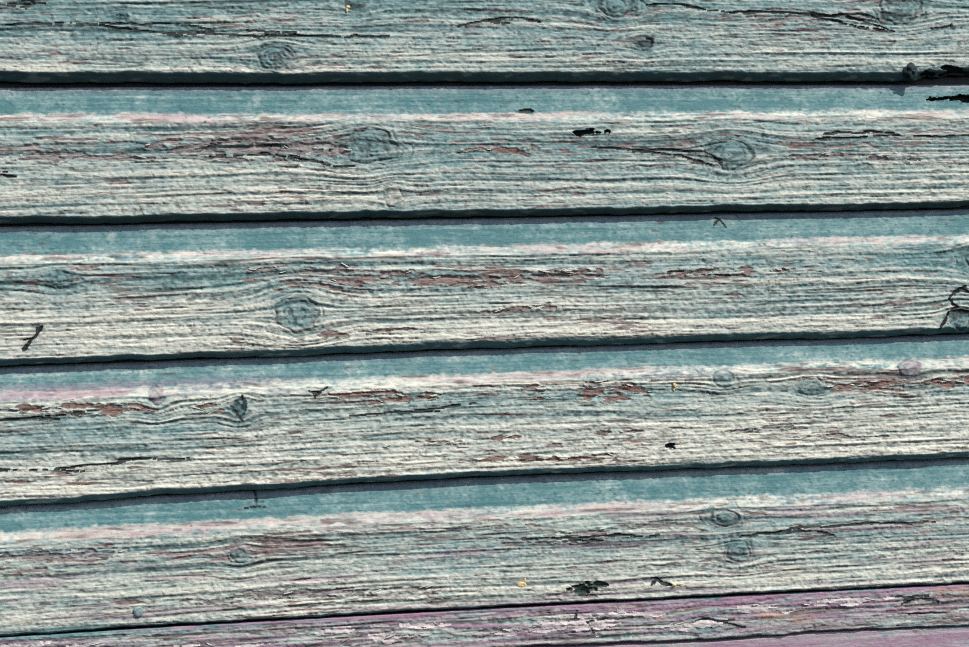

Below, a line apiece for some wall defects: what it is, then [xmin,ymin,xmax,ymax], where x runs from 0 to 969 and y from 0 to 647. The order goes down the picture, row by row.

crack [0,2,390,38]
crack [646,3,895,32]
crack [591,146,723,165]
peeling [379,268,605,289]
crack [939,285,969,329]
crack [22,325,43,351]
peeling [328,387,444,405]
peeling [523,379,652,403]
crack [0,457,190,472]
spalling [566,581,609,594]
peeling [737,595,895,614]
peeling [491,608,725,637]